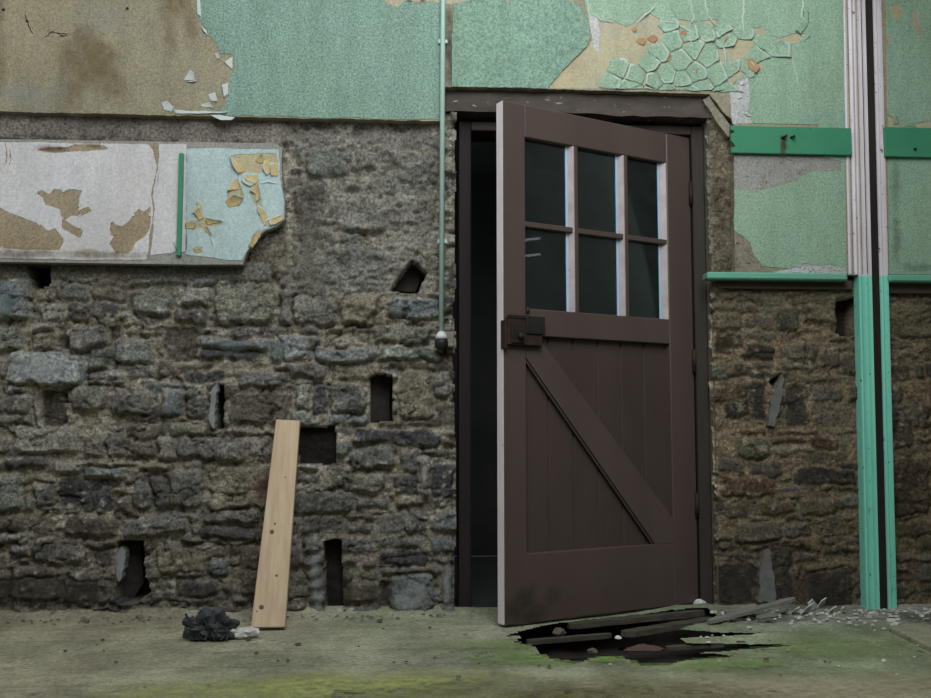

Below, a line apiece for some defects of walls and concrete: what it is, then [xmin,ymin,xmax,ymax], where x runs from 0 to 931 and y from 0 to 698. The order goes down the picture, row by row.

peeling [549,5,810,124]
peeling [36,143,108,153]
spalling [733,154,842,192]
peeling [0,189,91,250]
peeling [109,207,152,254]
peeling [185,199,225,236]
peeling [226,153,284,248]
spalling [147,244,213,263]
spalling [733,231,847,274]